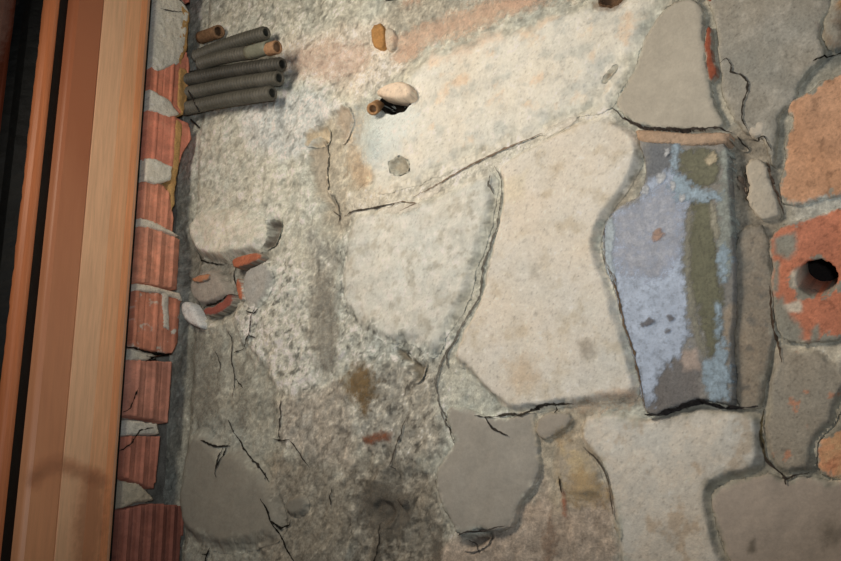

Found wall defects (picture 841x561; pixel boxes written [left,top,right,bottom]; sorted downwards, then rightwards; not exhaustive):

crack [603,228,809,485]
crack [200,420,268,480]
crack [275,397,310,468]
crack [260,499,294,561]